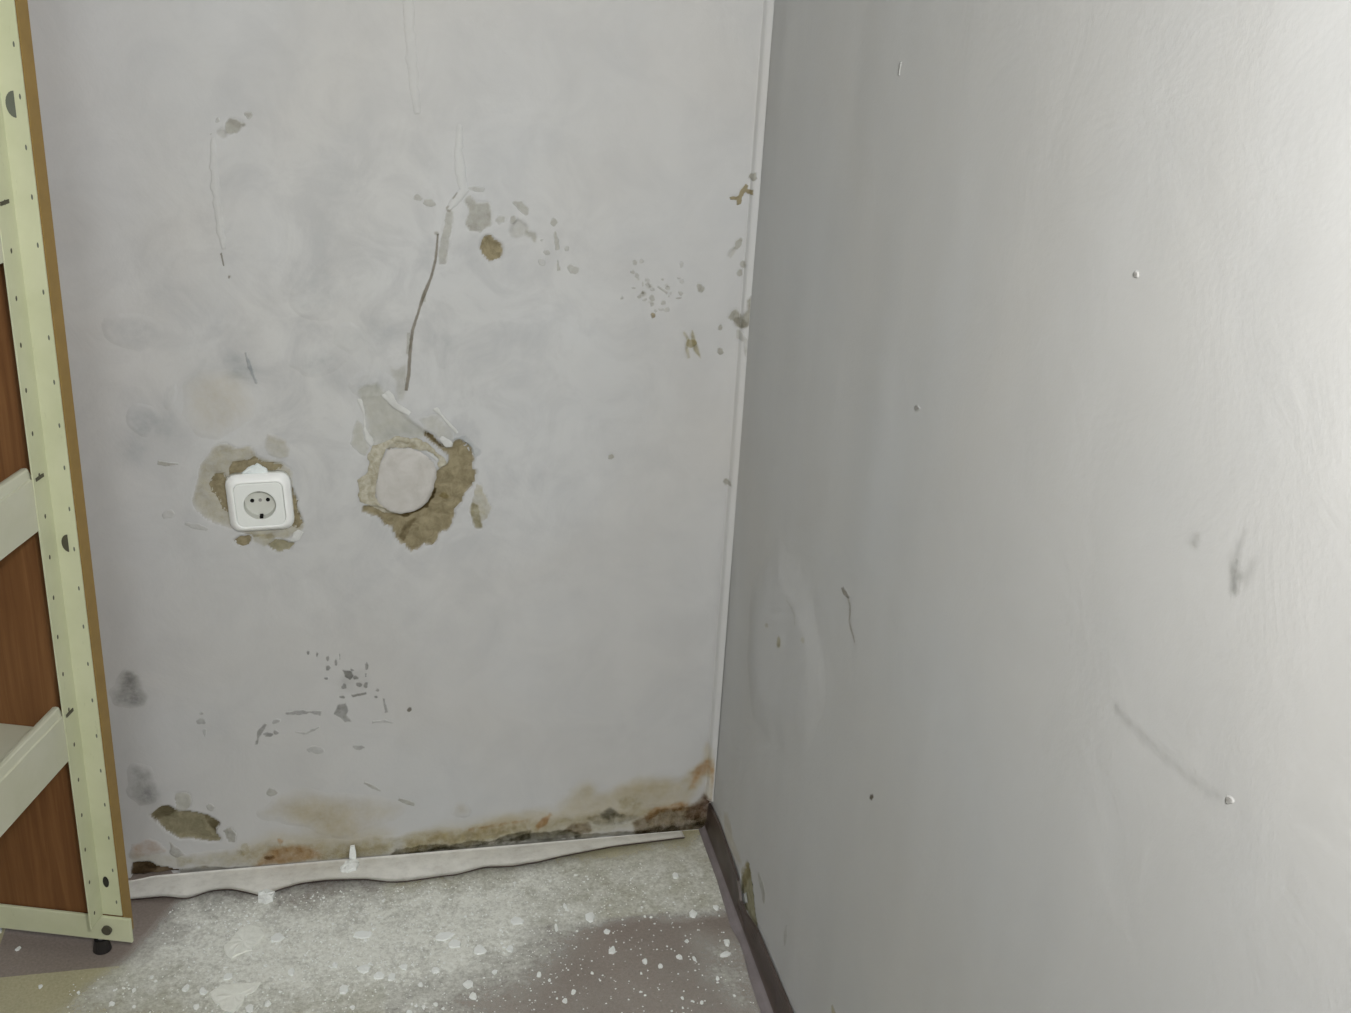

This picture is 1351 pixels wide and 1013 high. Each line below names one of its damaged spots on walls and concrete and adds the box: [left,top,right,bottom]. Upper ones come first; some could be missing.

peeling [414,186,529,265]
crack [405,233,439,391]
flaking render [192,433,305,553]
flaking render [350,390,492,553]
water stain [126,763,162,806]
flaking render [130,792,237,875]
water stain [176,781,577,870]